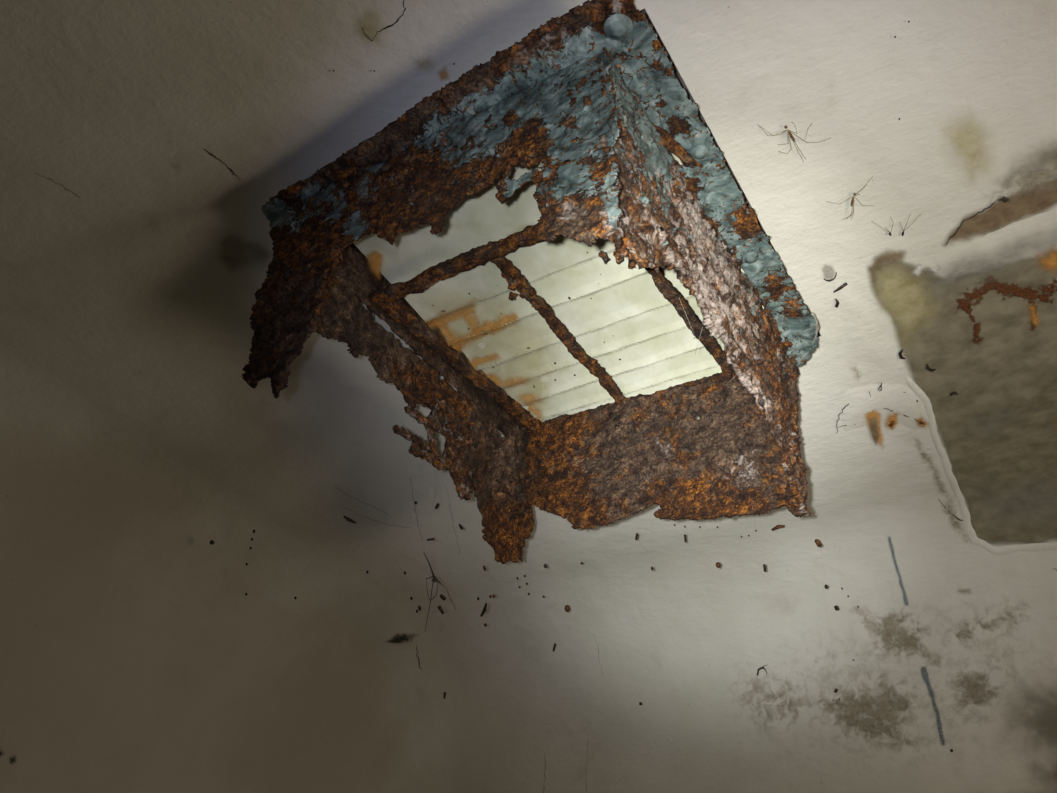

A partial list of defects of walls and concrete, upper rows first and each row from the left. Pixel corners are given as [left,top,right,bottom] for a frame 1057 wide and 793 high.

rust [566,68,600,112]
rust [287,114,583,217]
rust [367,252,382,278]
rust [598,250,635,269]
rust [501,270,538,307]
rust [957,251,1057,344]
rust [427,305,517,351]
rust [471,354,542,422]
spalling [867,254,1057,555]
damp [878,615,918,650]
damp [829,690,908,738]